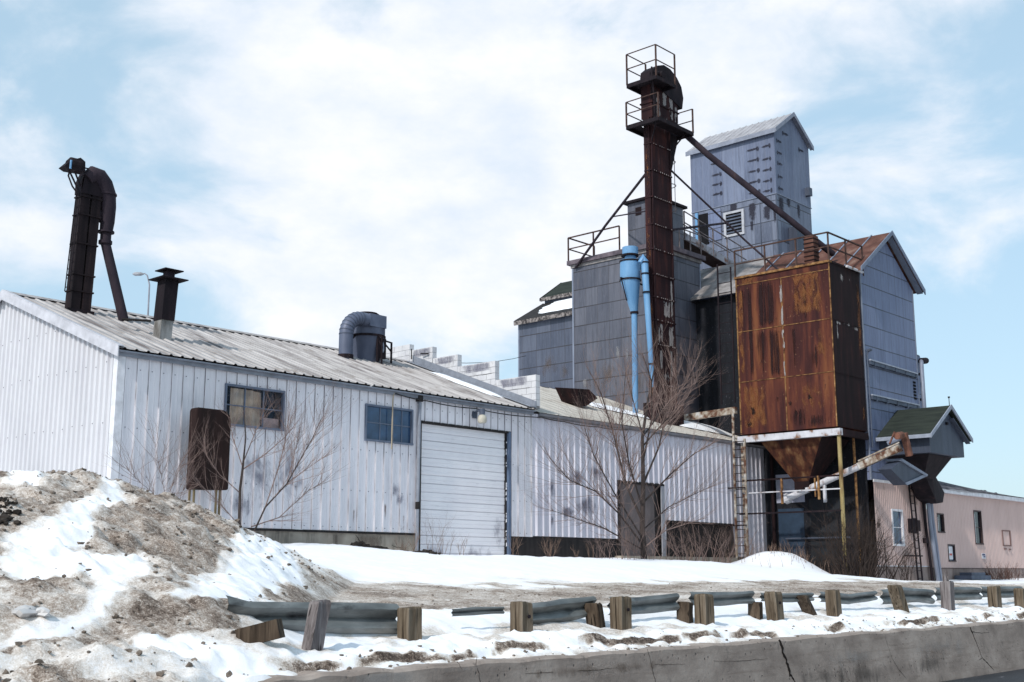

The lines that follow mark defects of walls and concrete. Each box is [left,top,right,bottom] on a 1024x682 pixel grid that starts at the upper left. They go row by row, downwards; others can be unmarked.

rust [738,277,780,375]
crack [744,639,795,682]